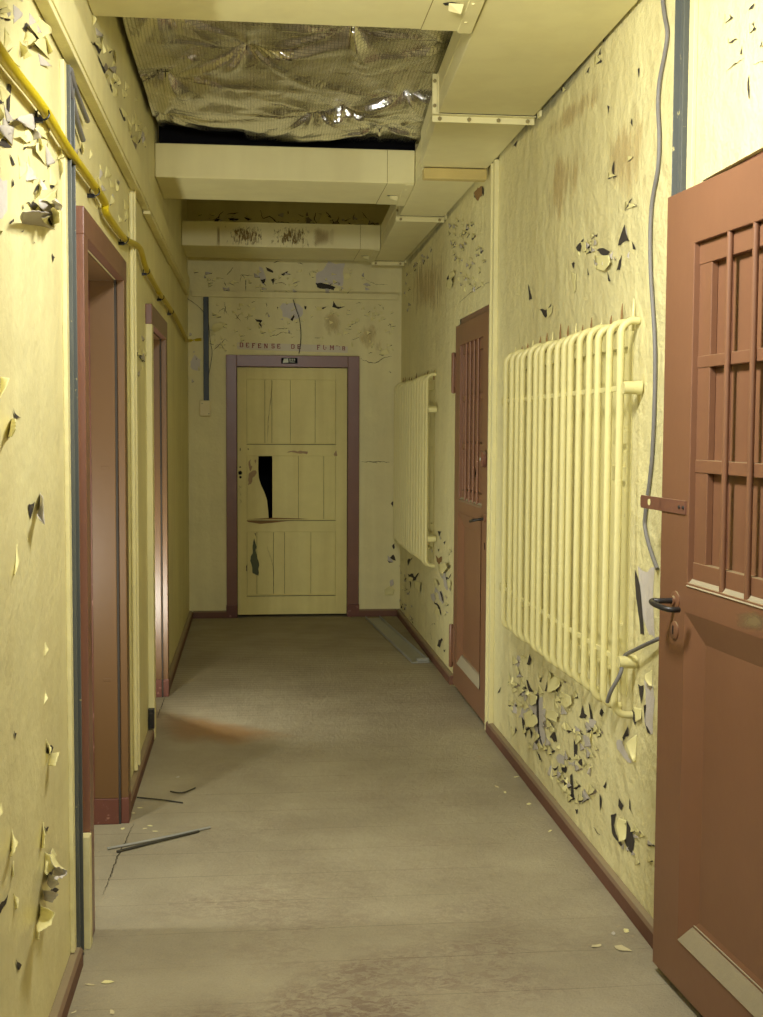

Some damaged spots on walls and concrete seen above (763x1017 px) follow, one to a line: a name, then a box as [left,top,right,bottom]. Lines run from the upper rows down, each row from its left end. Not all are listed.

peeling [0,0,53,67]
peeling [91,14,148,149]
peeling [0,84,64,235]
peeling [194,261,395,353]
peeling [385,531,452,652]
peeling [635,567,655,638]
peeling [46,740,60,766]
peeling [498,655,606,814]
peeling [616,670,655,763]
peeling [611,798,654,865]
peeling [0,893,19,913]
peeling [36,822,67,940]